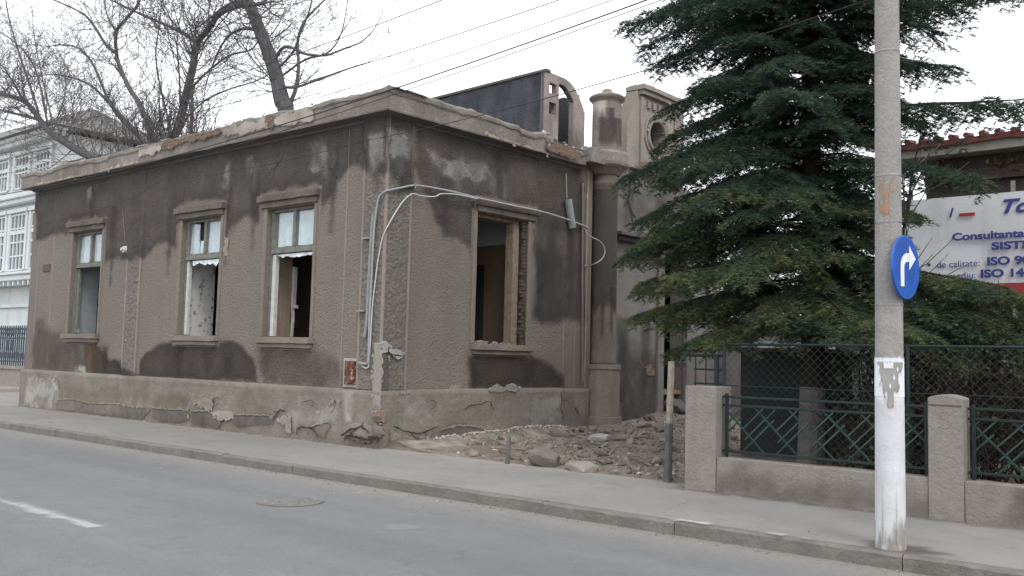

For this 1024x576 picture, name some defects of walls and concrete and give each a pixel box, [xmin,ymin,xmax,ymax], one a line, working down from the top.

flaking render [546,139,582,159]
damp [35,116,612,330]
damp [32,327,330,386]
flaking render [25,378,340,438]
spalling [370,341,410,439]